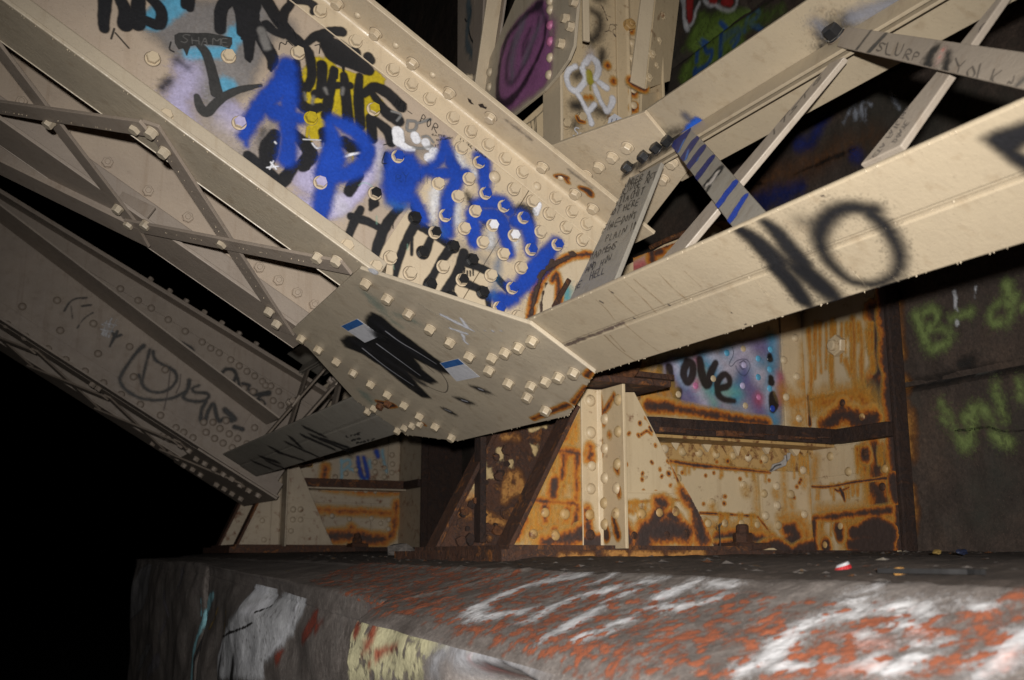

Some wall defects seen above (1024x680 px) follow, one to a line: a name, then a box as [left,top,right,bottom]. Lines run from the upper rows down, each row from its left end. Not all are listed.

rust [515,286,902,557]
rust [316,462,400,547]
rust [486,444,511,497]